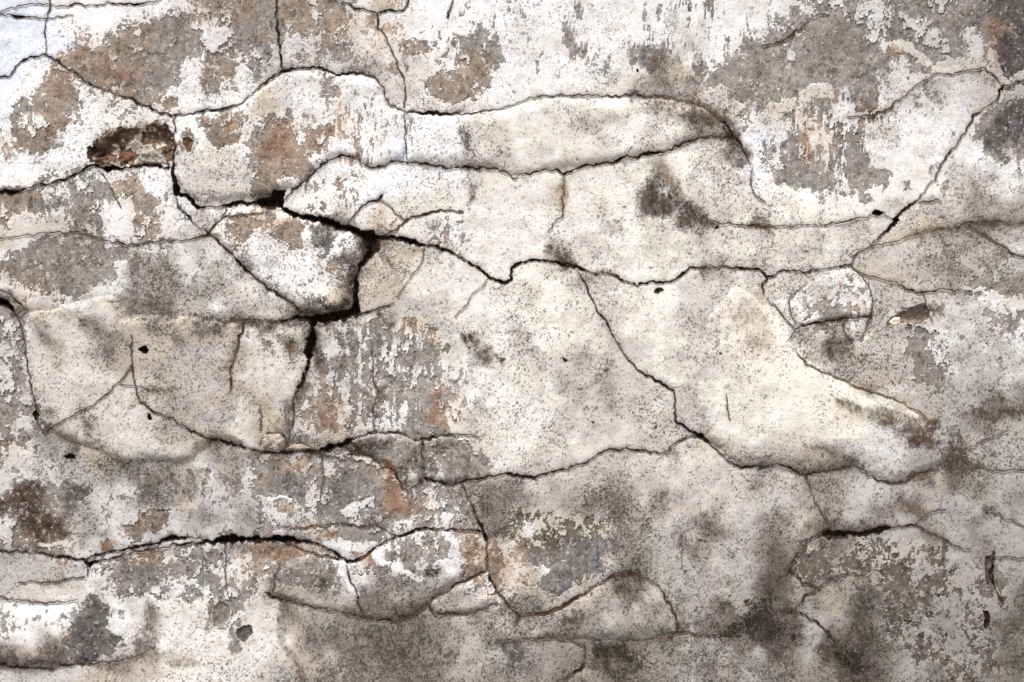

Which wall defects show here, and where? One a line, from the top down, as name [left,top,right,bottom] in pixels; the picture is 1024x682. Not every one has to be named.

peeling [692,0,1024,225]
crack [0,0,1024,447]
water stain [643,159,719,229]
peeling [0,0,617,667]
crack [0,269,972,644]
crack [961,431,1024,472]
crack [989,550,1024,603]
crack [0,655,144,671]
crack [500,638,586,682]